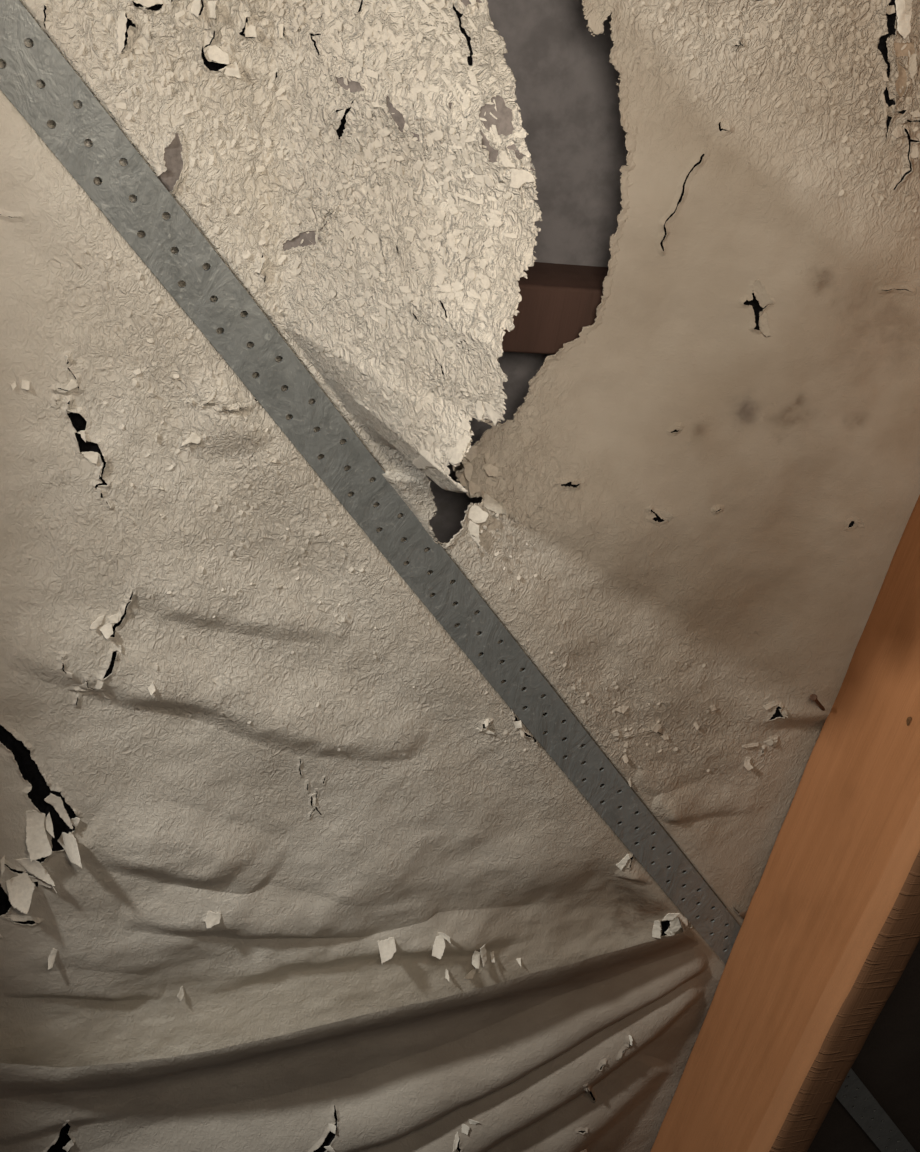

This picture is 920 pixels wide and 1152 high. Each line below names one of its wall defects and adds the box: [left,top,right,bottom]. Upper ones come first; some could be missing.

peeling [588,16,604,34]
crack [871,0,920,196]
crack [655,147,711,256]
peeling [78,0,543,553]
peeling [276,484,338,590]
peeling [1,793,82,914]
peeling [48,948,57,970]
peeling [200,911,221,928]